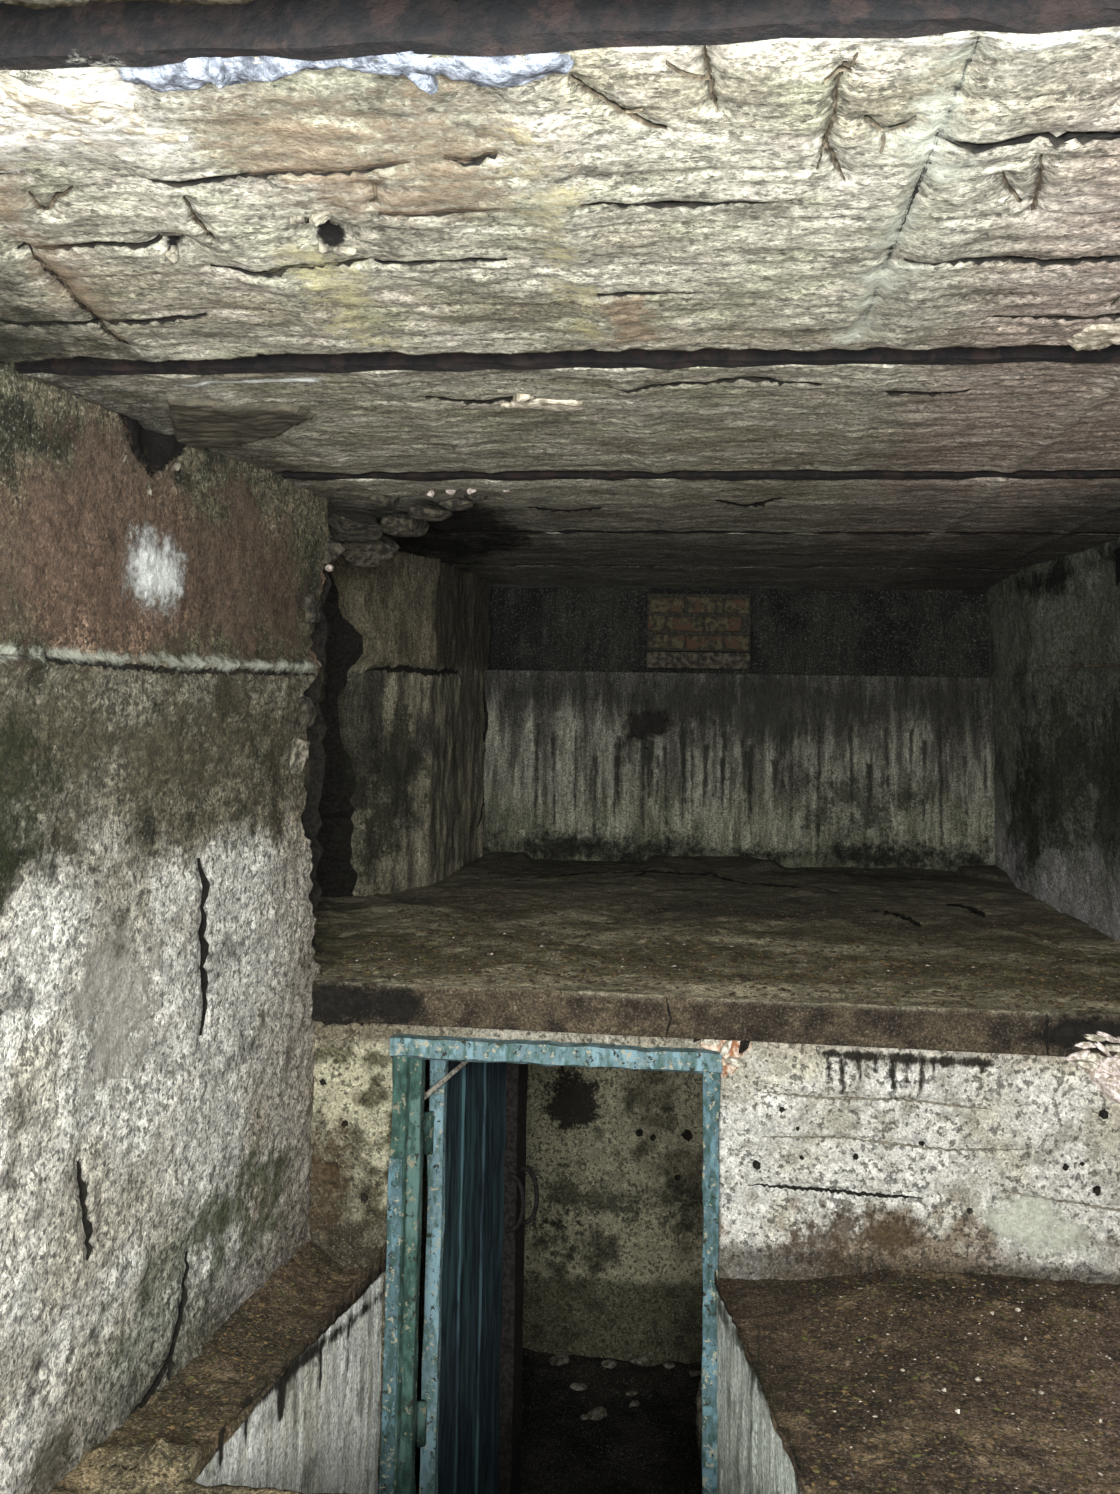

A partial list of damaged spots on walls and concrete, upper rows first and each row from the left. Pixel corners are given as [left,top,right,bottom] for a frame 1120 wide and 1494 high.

crack [0,150,507,344]
crack [594,290,704,298]
crack [581,200,792,209]
crack [816,36,1120,324]
water stain [0,627,324,866]
water stain [504,676,992,869]
water stain [1007,673,1120,883]
crack [197,858,210,1036]
water stain [816,1049,995,1100]
water stain [1031,1016,1120,1051]
spalling [1063,1031,1120,1119]
crack [76,1161,93,1261]